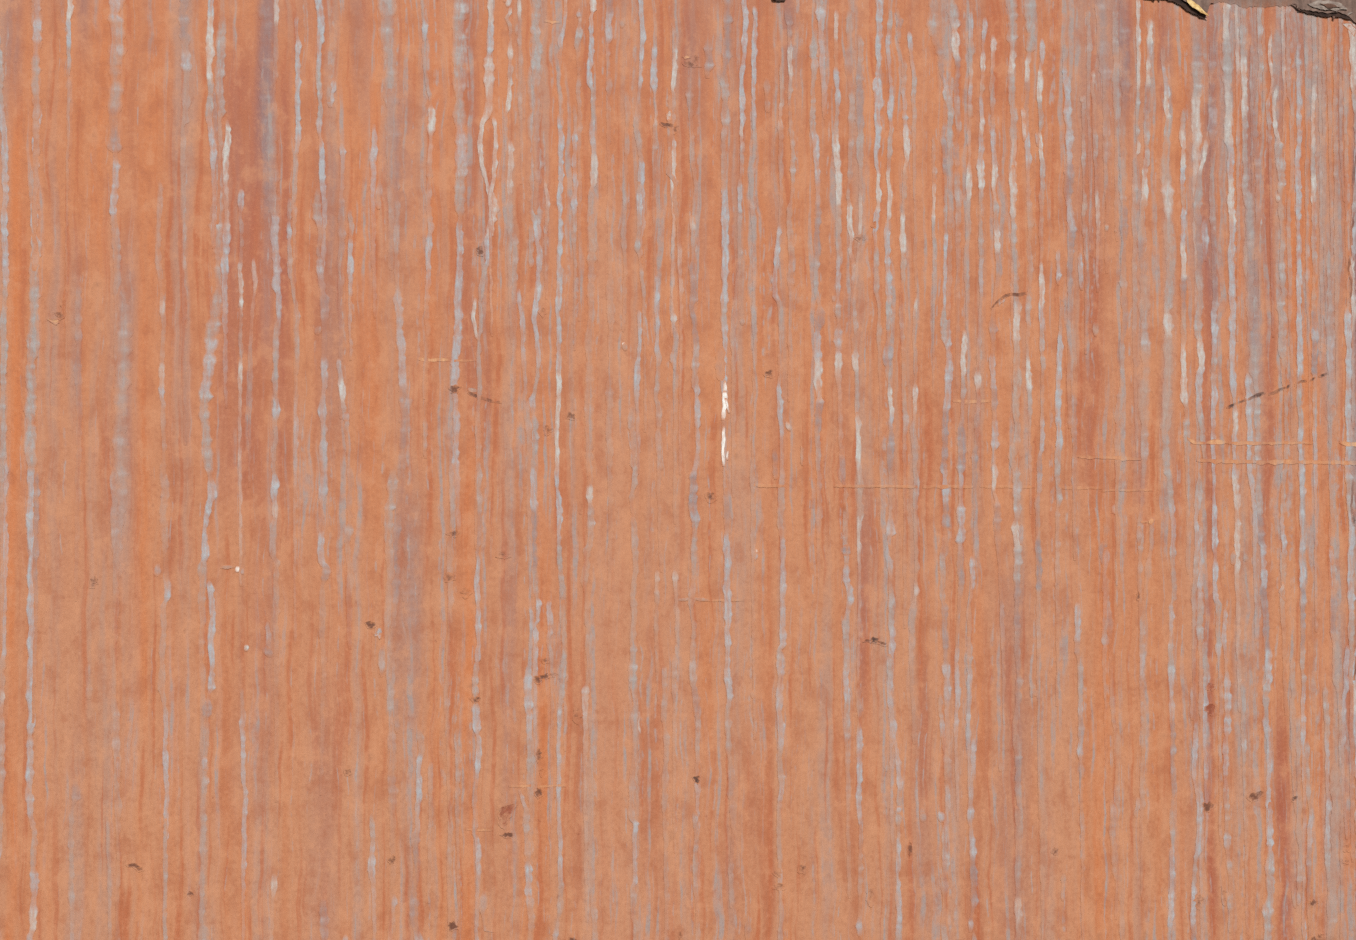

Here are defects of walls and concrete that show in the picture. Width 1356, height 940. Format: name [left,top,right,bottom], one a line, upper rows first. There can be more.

peeling [1168,0,1209,18]
peeling [1293,0,1356,37]
corrosion [365,620,382,640]
corrosion [533,658,558,684]
corrosion [1204,682,1216,716]
corrosion [1202,800,1216,813]
corrosion [497,803,517,838]